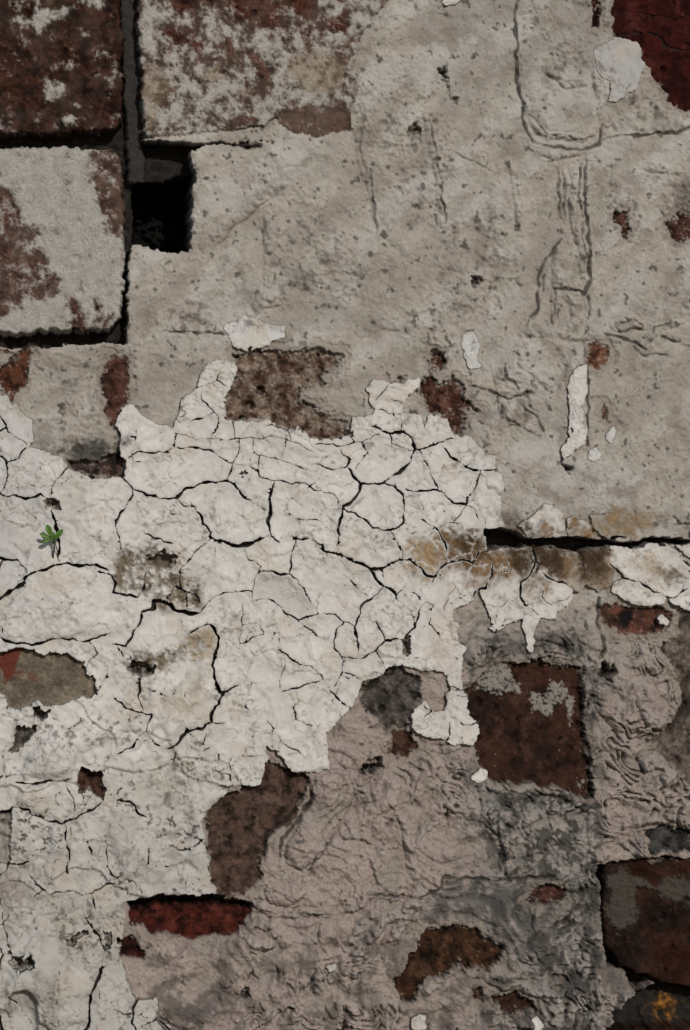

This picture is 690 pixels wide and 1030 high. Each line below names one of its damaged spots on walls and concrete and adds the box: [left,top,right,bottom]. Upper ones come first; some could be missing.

spalling [591,0,690,113]
spalling [406,122,422,139]
crack [513,0,690,448]
crack [469,364,545,434]
crack [610,516,690,610]
peeling [0,314,690,1030]
crack [578,597,607,695]
crack [585,742,595,795]
crack [0,707,149,1030]
crack [262,771,321,862]
crack [365,811,568,902]
crack [127,997,187,1030]